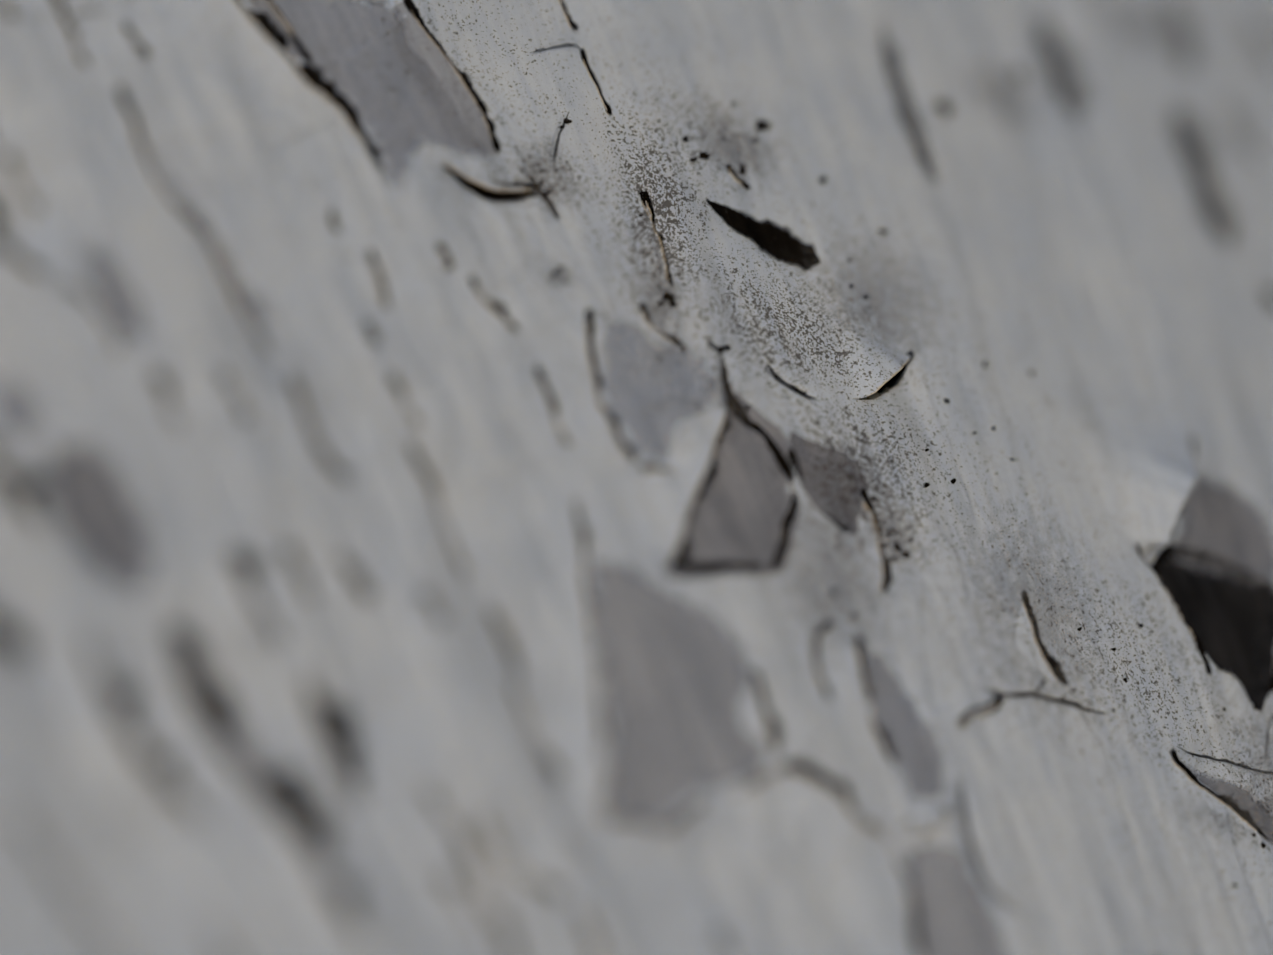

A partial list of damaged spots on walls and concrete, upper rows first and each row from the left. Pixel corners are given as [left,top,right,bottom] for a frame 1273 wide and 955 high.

peeling [159,0,501,207]
crack [441,112,569,219]
crack [707,199,821,270]
crack [710,341,760,434]
crack [767,364,816,399]
peeling [828,315,914,399]
peeling [520,303,892,600]
spalling [1082,423,1273,711]
peeling [518,492,1007,955]
crack [984,677,1109,714]
crack [1178,713,1273,774]